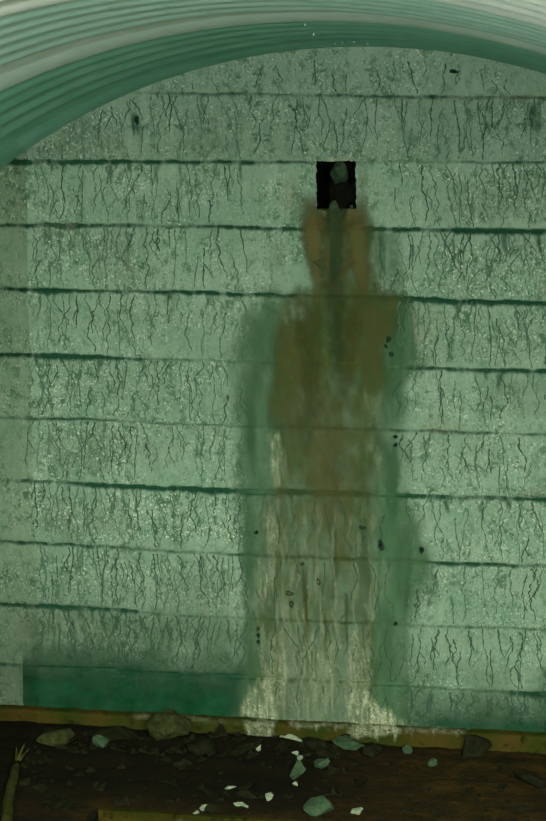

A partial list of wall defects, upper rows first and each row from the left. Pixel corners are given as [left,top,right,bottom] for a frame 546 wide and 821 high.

crack [0,67,546,720]
corrosion [269,209,399,662]
damp [348,436,428,733]
damp [374,297,417,426]